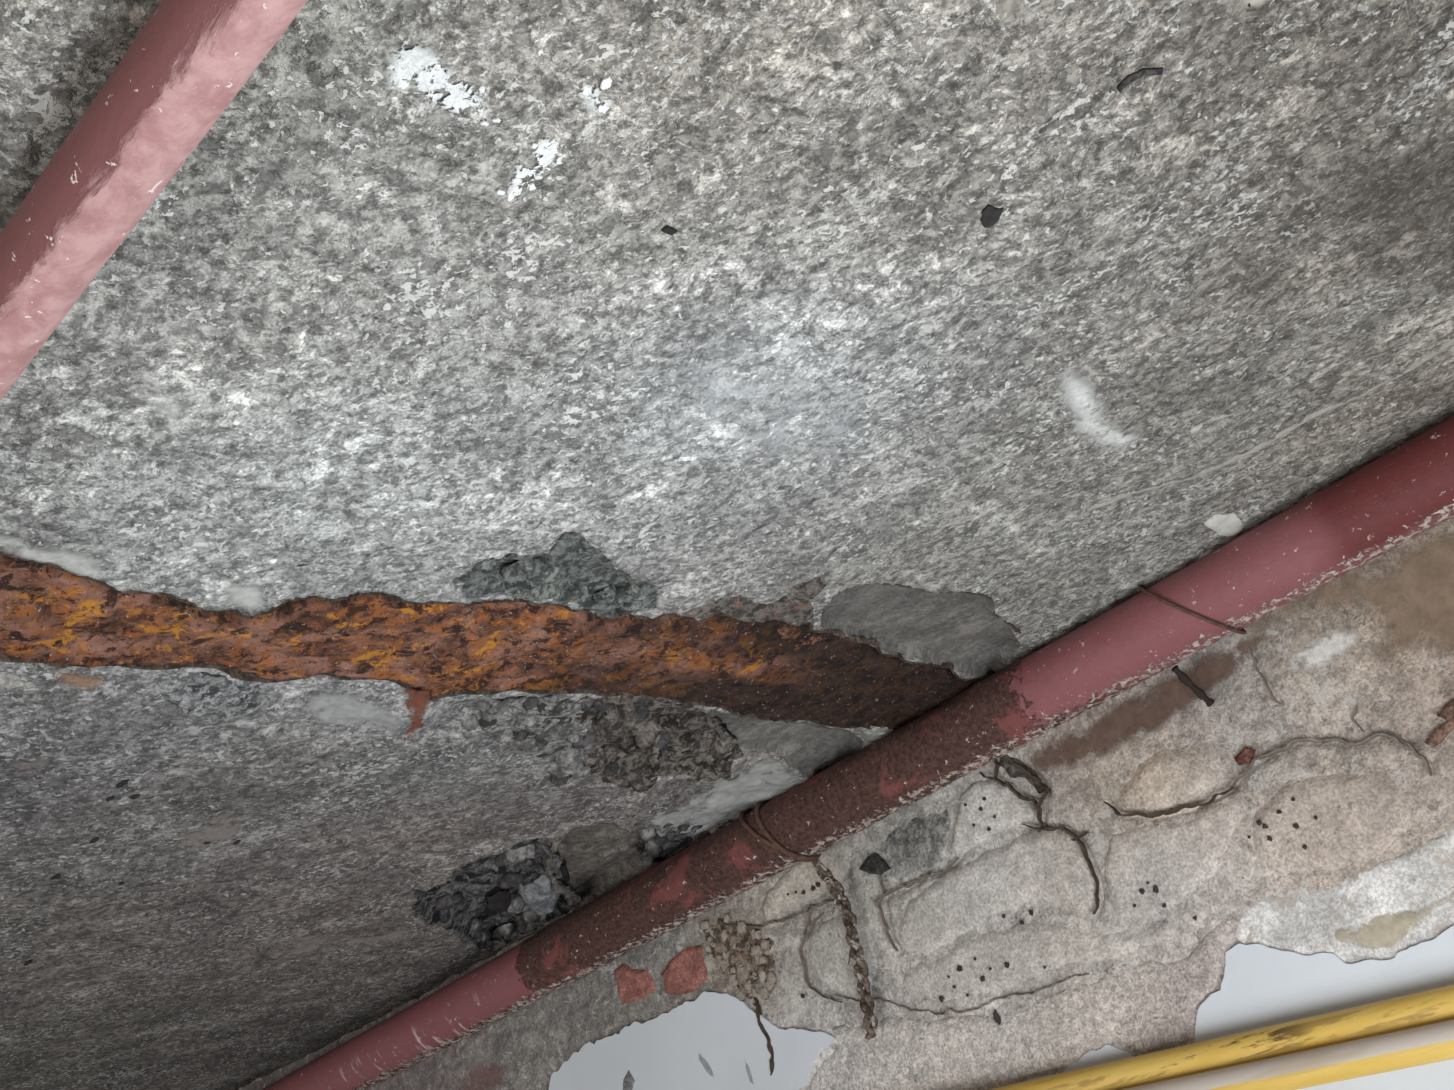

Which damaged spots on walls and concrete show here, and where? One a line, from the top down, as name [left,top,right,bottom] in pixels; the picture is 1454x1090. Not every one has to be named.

rust [406,690,430,738]
spalling [0,652,871,793]
peeling [0,531,1020,681]
rust [777,626,822,651]
crack [1251,649,1282,704]
spalling [106,779,140,801]
peeling [368,517,1454,1090]
crack [979,705,1432,914]
crack [716,900,1088,1015]
crack [872,858,959,951]